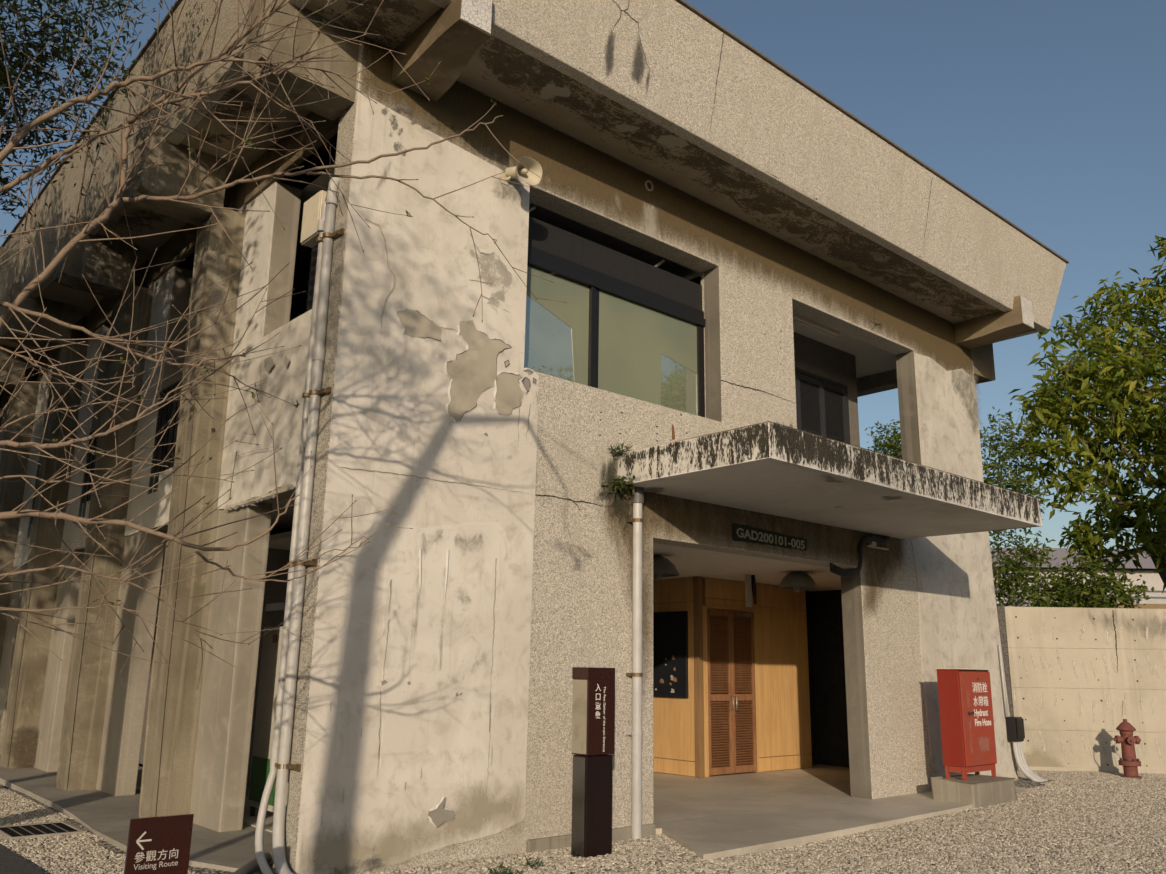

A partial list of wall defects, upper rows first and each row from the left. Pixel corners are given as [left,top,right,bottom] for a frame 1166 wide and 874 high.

crack [612,0,650,96]
damp [312,0,1006,374]
peeling [397,308,537,423]
damp [608,421,1041,606]
peeling [428,796,455,828]